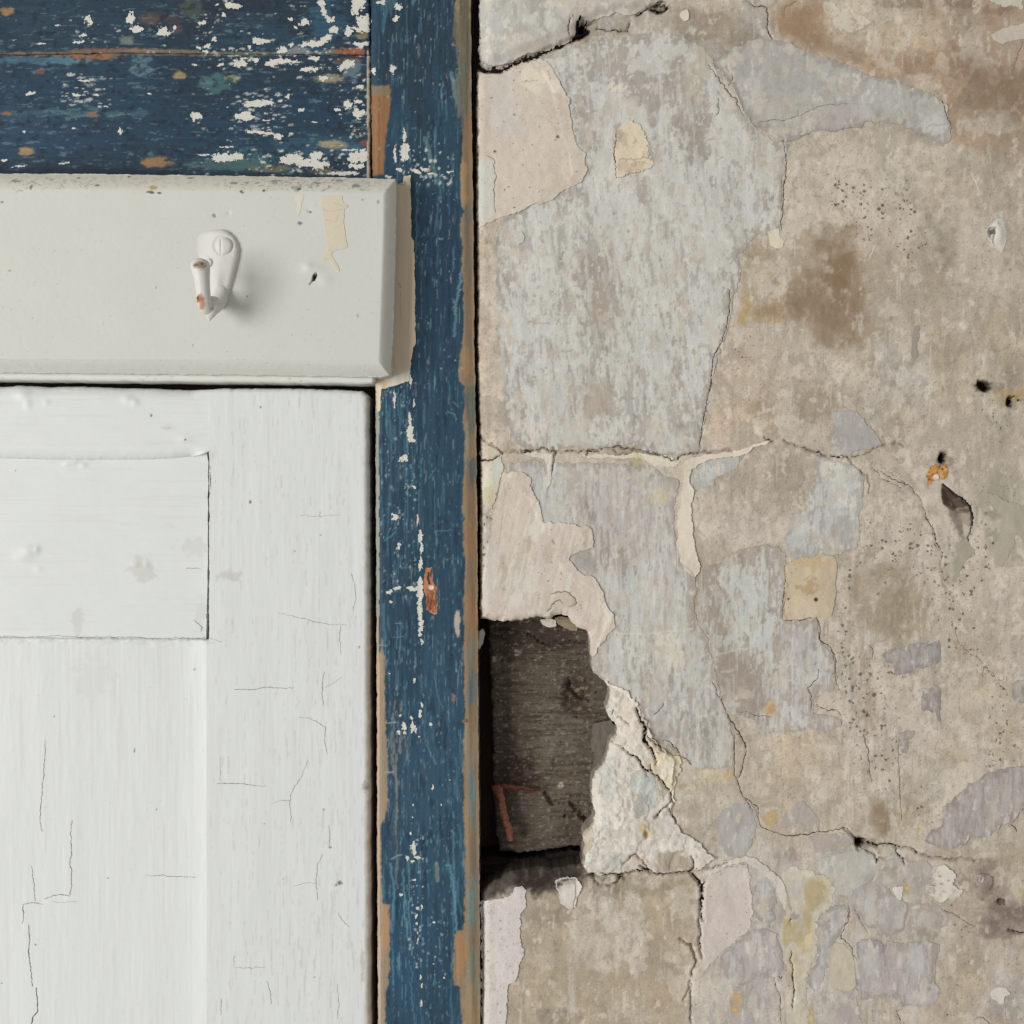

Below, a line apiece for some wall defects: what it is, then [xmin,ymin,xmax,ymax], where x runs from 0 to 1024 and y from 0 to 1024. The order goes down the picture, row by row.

spalling [215,0,403,82]
crack [475,1,668,73]
spalling [235,94,290,140]
spalling [279,148,369,176]
spalling [385,128,454,179]
crack [480,290,730,471]
peeling [476,0,952,1024]
corrosion [926,465,948,484]
spalling [386,514,438,645]
crack [610,703,692,818]
crack [712,683,957,861]
crack [589,854,727,975]